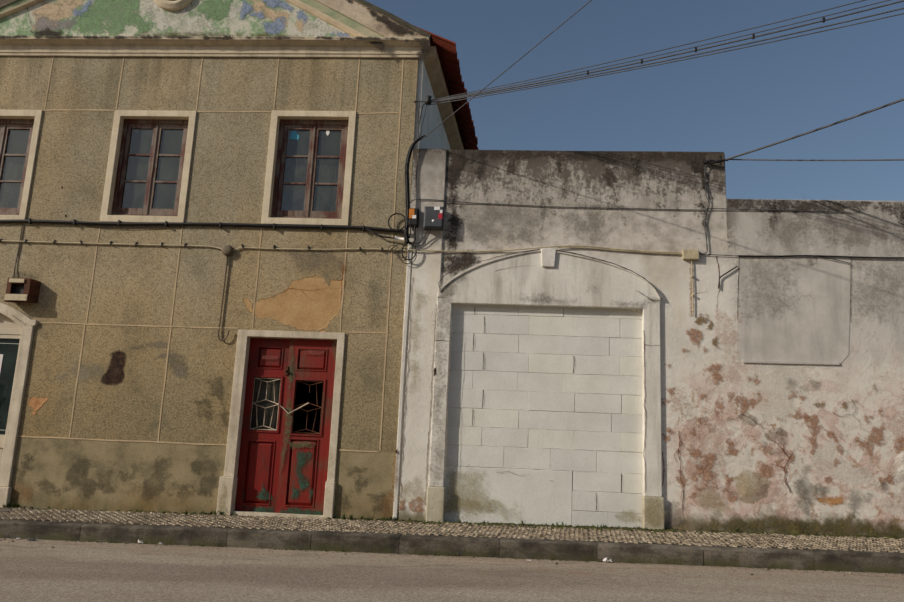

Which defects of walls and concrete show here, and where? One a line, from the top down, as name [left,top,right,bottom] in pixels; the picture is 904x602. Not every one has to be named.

peeling [32,0,349,37]
leakage [441,150,708,281]
leakage [727,199,904,239]
peeling [243,275,345,332]
peeling [682,313,736,352]
peeling [705,364,722,384]
peeling [243,401,323,515]
crack [643,330,684,521]
peeling [663,376,761,502]
peeling [788,391,843,466]
peeling [855,409,904,455]
peeling [817,496,846,506]